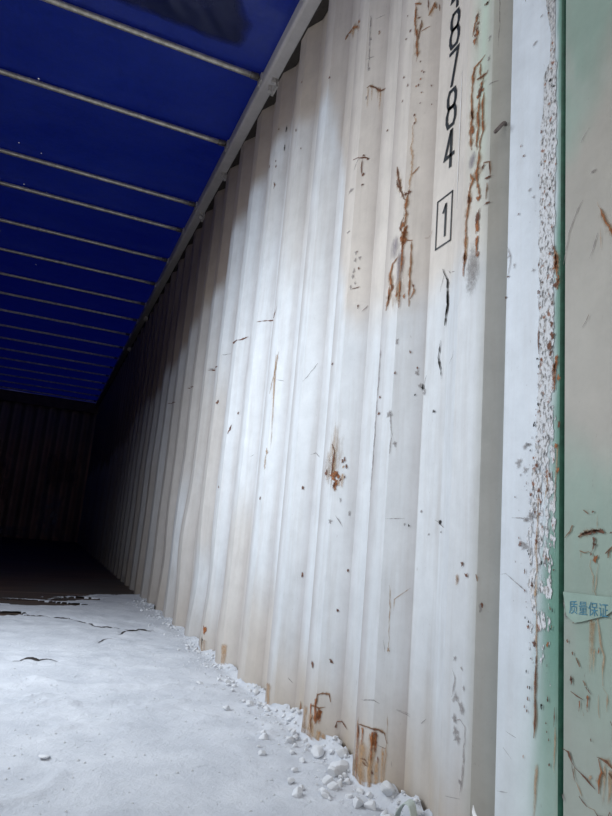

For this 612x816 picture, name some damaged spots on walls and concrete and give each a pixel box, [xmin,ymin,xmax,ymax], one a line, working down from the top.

rust [414,2,440,56]
rust [463,55,495,281]
peeling [516,0,557,663]
rust [325,436,347,490]
rust [565,525,612,594]
rust [300,693,331,739]
rust [353,721,388,785]